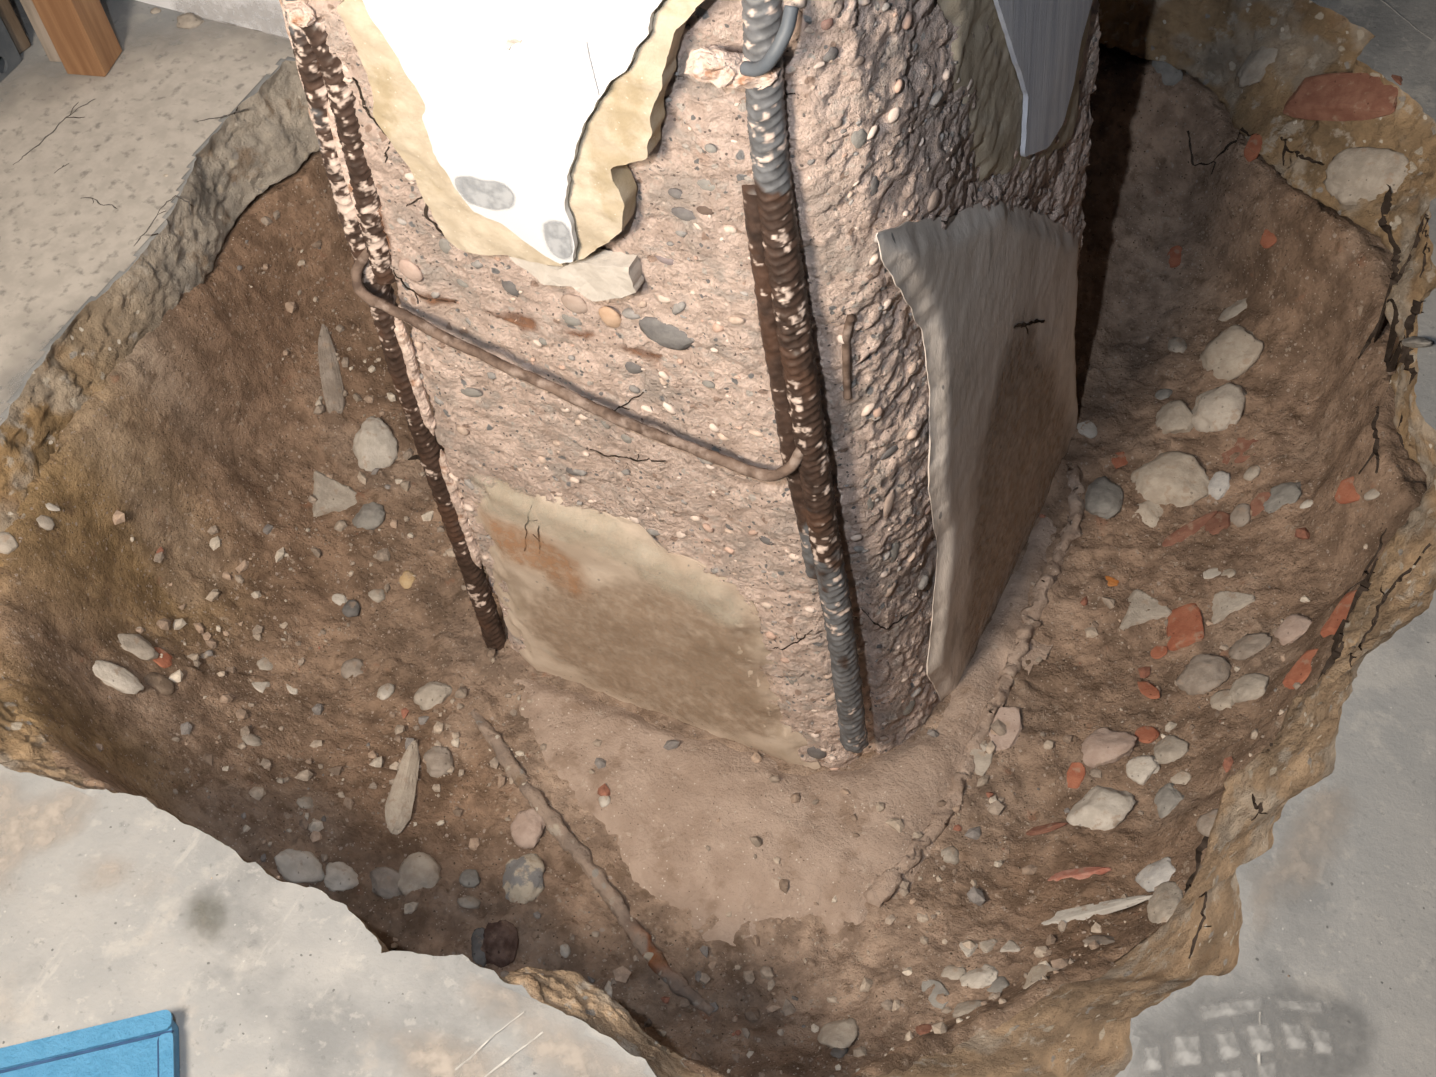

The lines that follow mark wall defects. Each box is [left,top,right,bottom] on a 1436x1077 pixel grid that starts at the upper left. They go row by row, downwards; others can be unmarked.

corrosion [420,296,455,304]
corrosion [496,314,536,330]
corrosion [624,347,659,358]
spalling [0,0,1436,776]
crack [1357,185,1430,475]
spalling [0,701,163,810]
water stain [536,591,767,731]
spalling [870,347,1436,1077]
crack [1251,794,1267,821]
crack [1318,528,1431,680]
crack [1185,836,1212,959]
spalling [499,966,705,1077]